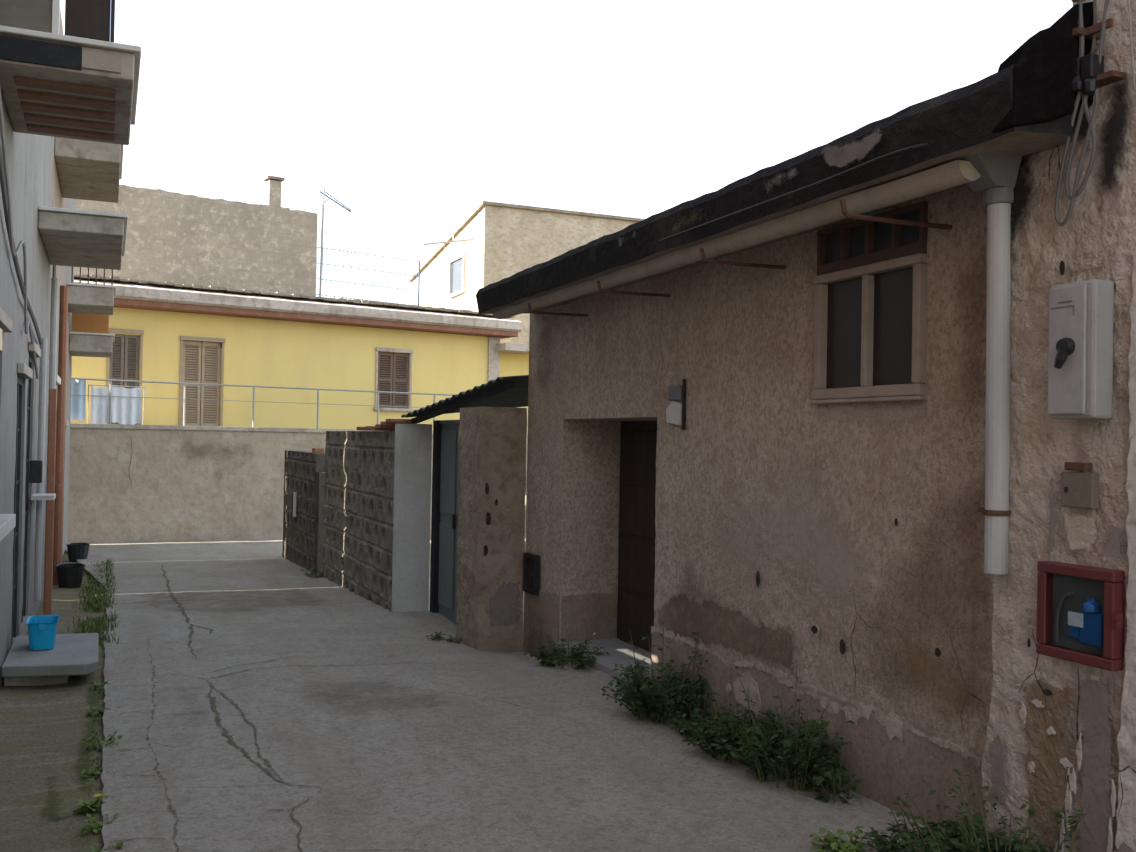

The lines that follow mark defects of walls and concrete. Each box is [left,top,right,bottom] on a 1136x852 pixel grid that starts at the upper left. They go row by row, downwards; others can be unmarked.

peeling [822,129,881,168]
leakage [1099,81,1130,189]
crack [109,564,401,852]
flaking render [651,625,983,769]
flaking render [1019,675,1134,852]